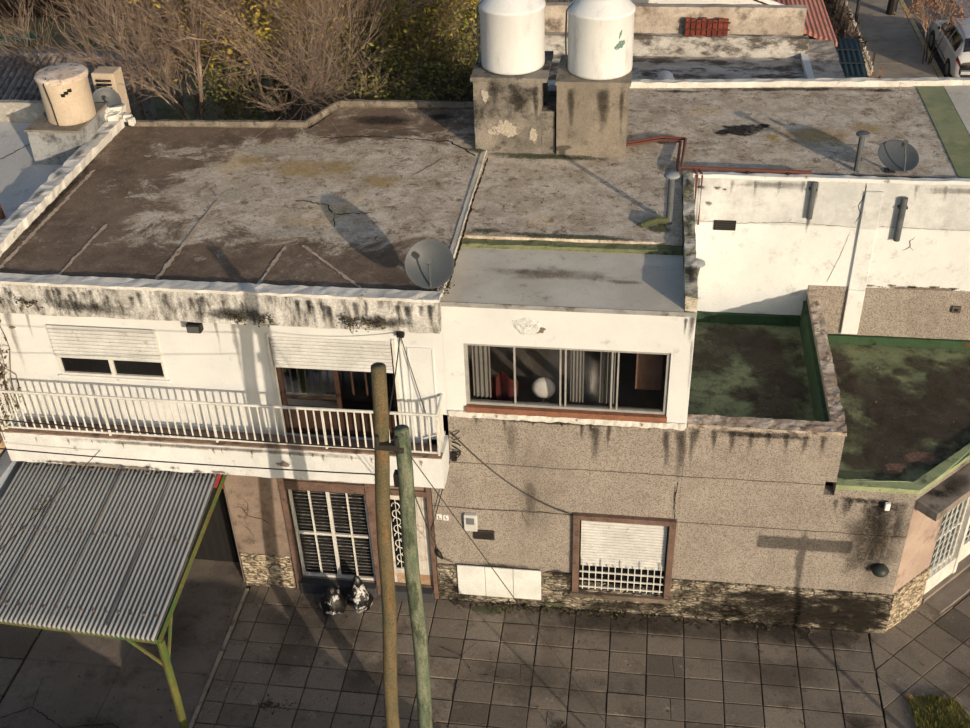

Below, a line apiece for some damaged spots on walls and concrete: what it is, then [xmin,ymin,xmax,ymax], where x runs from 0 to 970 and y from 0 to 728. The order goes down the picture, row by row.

damp [488,120,538,143]
crack [295,200,372,227]
crack [320,136,488,289]
damp [45,290,123,313]
damp [189,297,257,320]
damp [353,303,433,328]
damp [685,317,808,420]
damp [831,349,970,477]
damp [504,420,610,442]
damp [713,431,808,445]
damp [835,498,904,565]
damp [684,591,890,645]